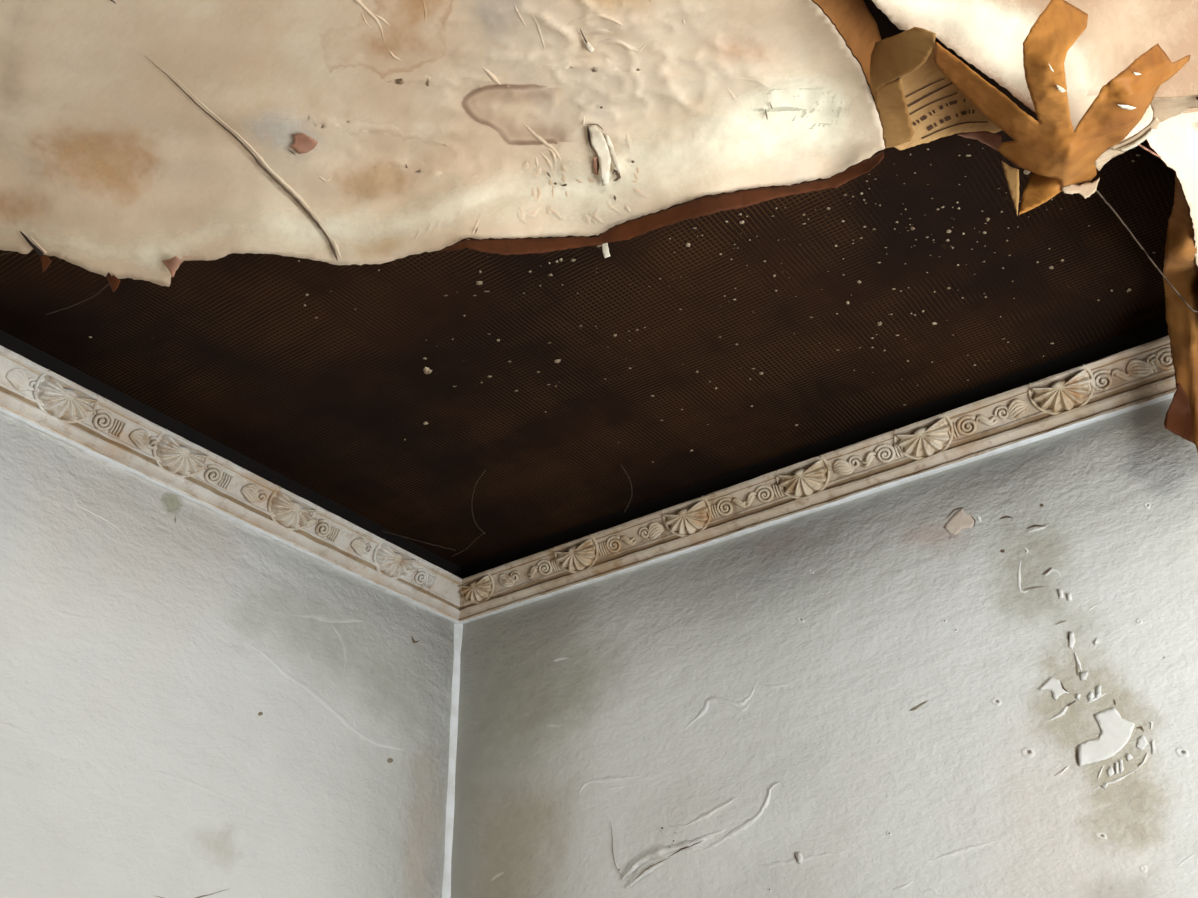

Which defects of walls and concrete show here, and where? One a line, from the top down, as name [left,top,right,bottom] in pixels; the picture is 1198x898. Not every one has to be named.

peeling [567,13,646,53]
damp [1150,0,1198,128]
peeling [287,133,318,155]
peeling [582,116,635,201]
peeling [1017,547,1072,601]
spalling [1039,619,1155,792]